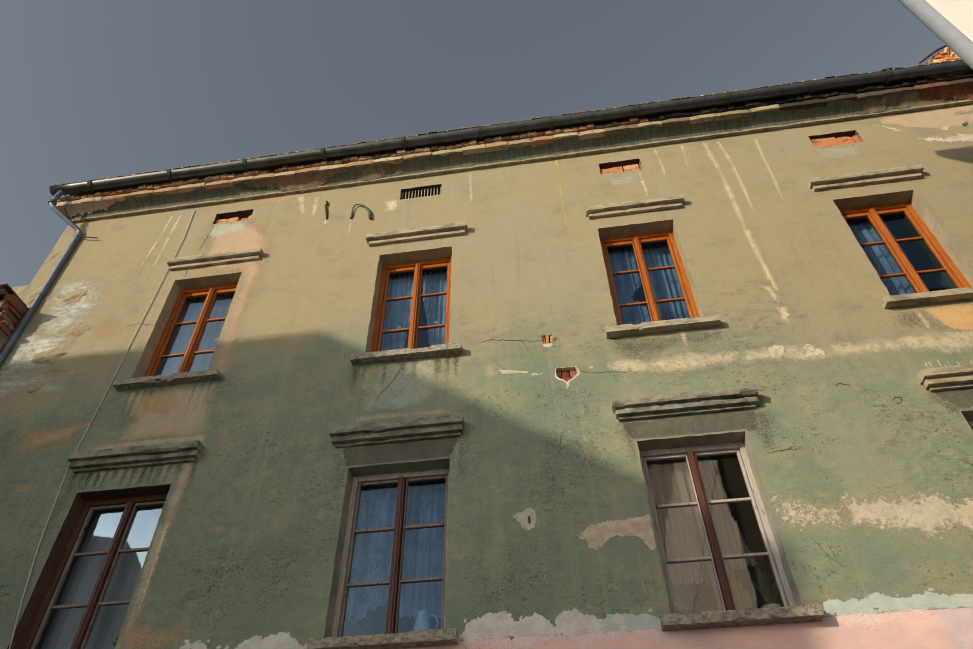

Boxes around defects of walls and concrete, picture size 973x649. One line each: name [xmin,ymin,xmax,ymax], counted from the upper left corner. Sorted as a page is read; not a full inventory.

water stain [702,139,790,323]
flaking render [555,366,580,389]
peeling [512,507,537,531]
peeling [577,513,656,550]
peeling [769,490,973,540]
peeling [823,588,973,617]
peeling [180,632,308,649]
peeling [458,608,662,643]